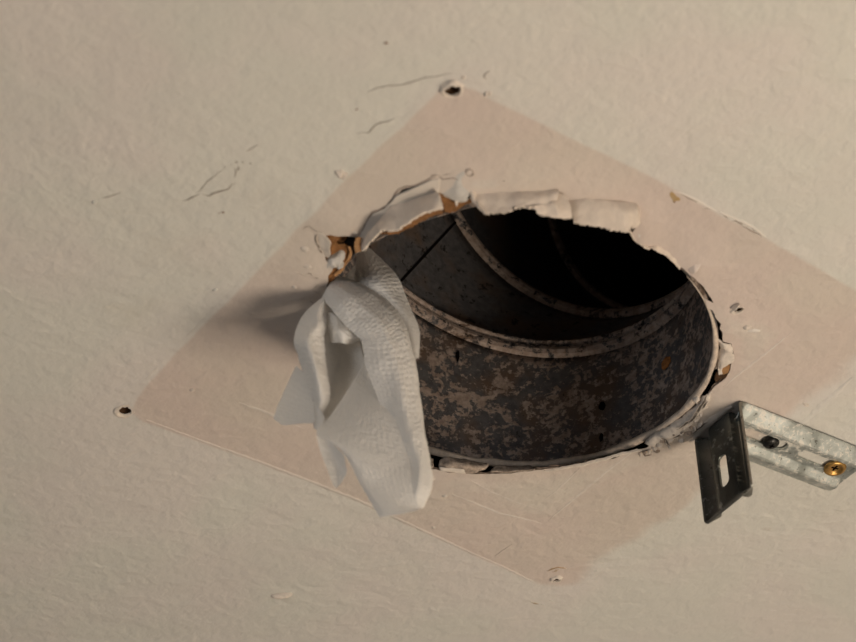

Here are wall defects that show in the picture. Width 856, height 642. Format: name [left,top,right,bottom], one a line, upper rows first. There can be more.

crack [183,144,259,201]
peeling [354,179,701,274]
spalling [545,338,734,472]